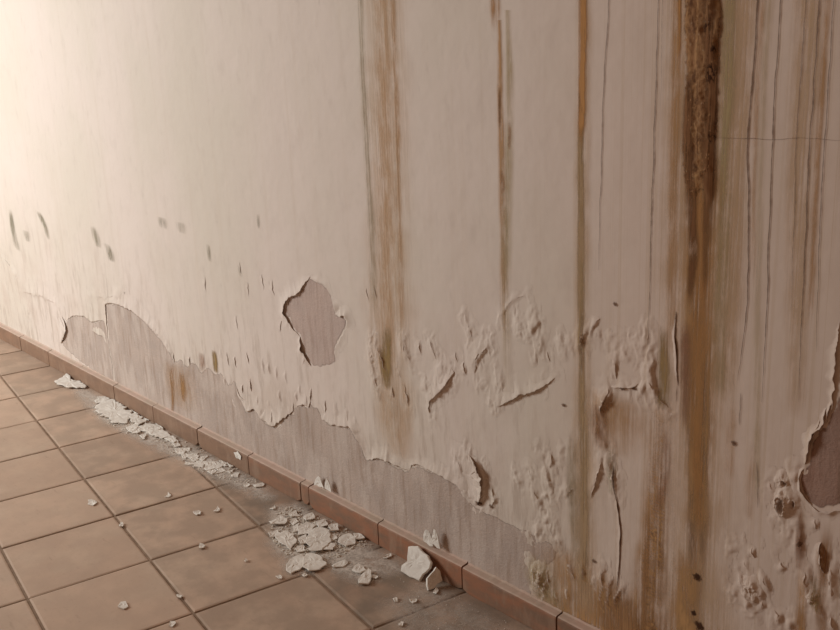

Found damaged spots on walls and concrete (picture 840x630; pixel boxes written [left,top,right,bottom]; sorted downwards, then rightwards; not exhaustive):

peeling [55,291,566,594]
peeling [276,272,356,367]
leakage [380,335,391,383]
rust [570,0,628,603]
crack [612,466,621,591]
peeling [797,322,840,520]